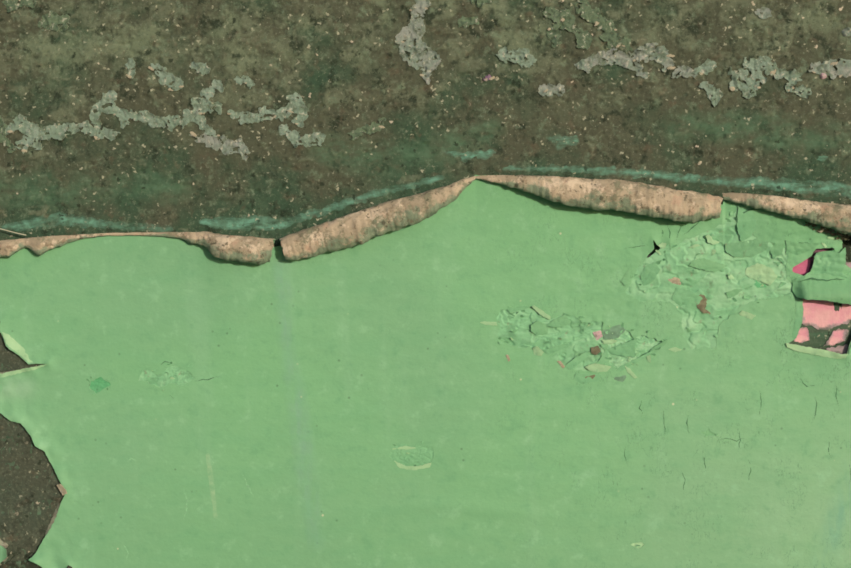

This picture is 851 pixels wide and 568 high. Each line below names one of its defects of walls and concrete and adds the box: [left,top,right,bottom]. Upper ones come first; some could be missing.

peeling [0,332,45,378]
peeling [480,204,851,384]
peeling [0,413,67,568]